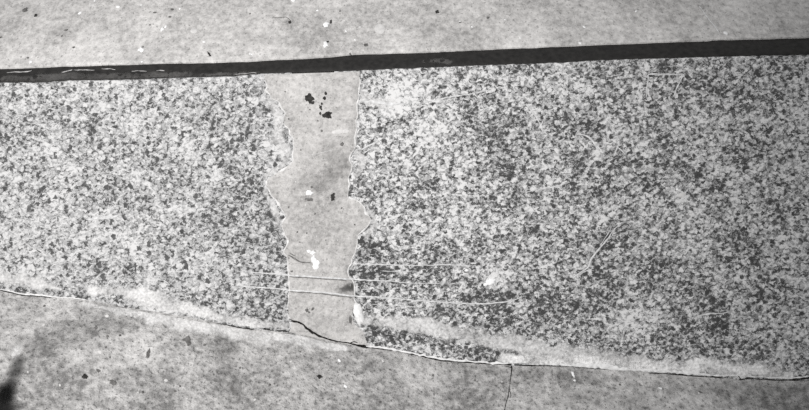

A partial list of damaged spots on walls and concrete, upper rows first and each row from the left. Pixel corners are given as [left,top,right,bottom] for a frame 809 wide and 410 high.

spalling [305,91,332,121]
spalling [349,303,364,325]
crack [213,319,606,410]
crack [651,373,809,381]